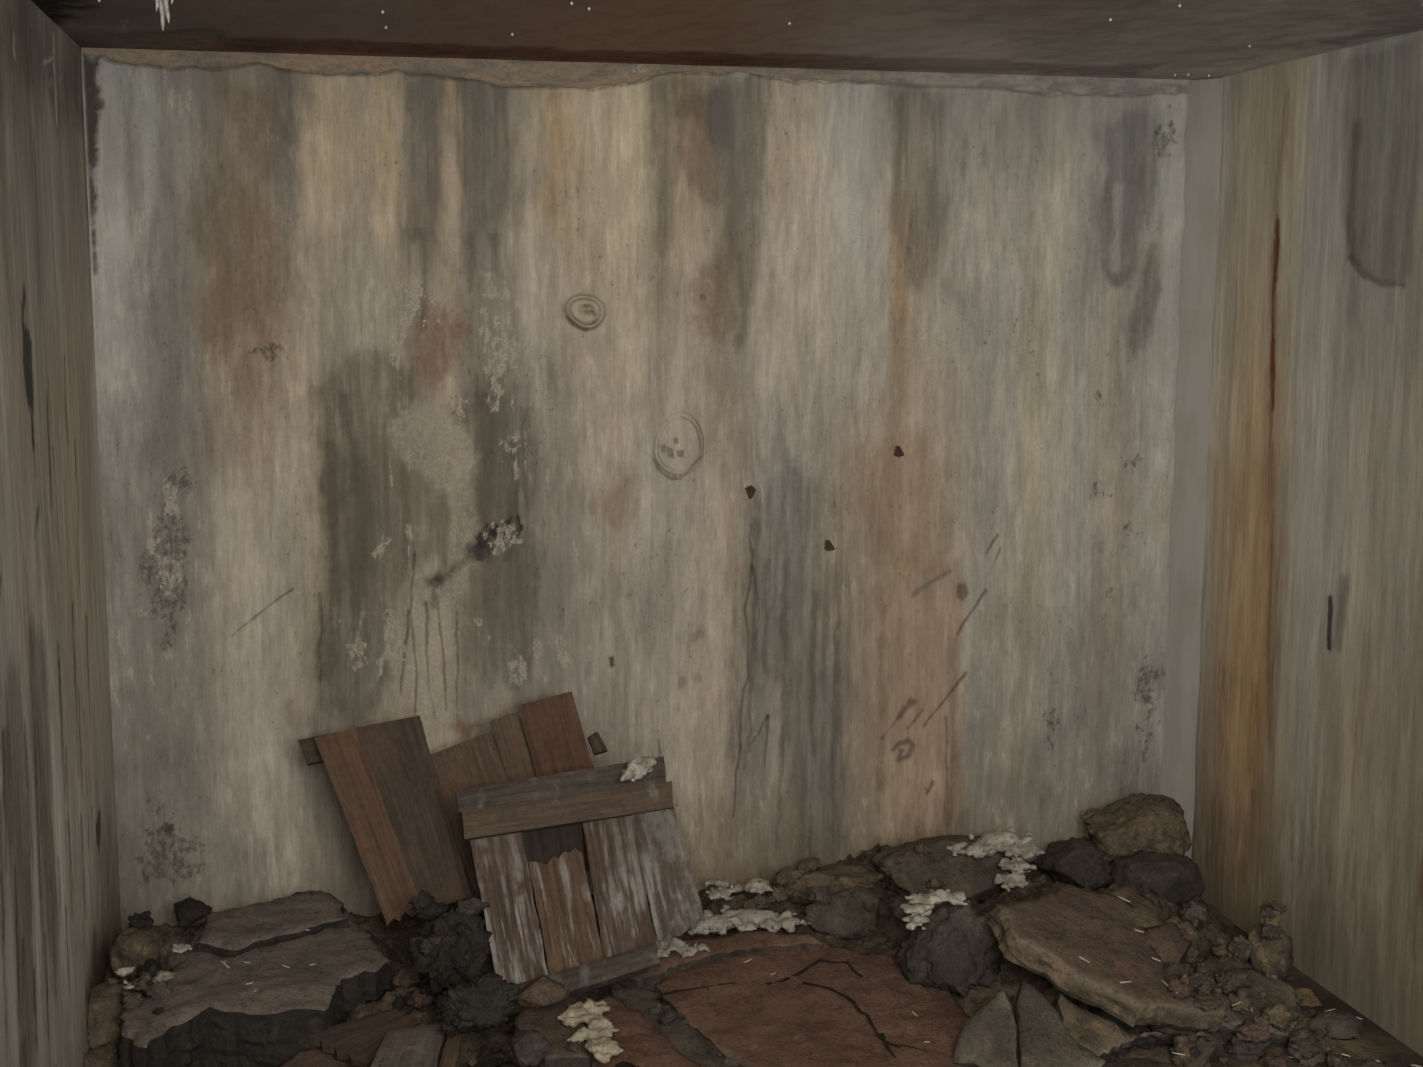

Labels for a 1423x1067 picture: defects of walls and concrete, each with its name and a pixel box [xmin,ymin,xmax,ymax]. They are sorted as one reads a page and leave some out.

water stain [31,0,91,126]
water stain [155,0,173,31]
crack [663,959,928,1058]